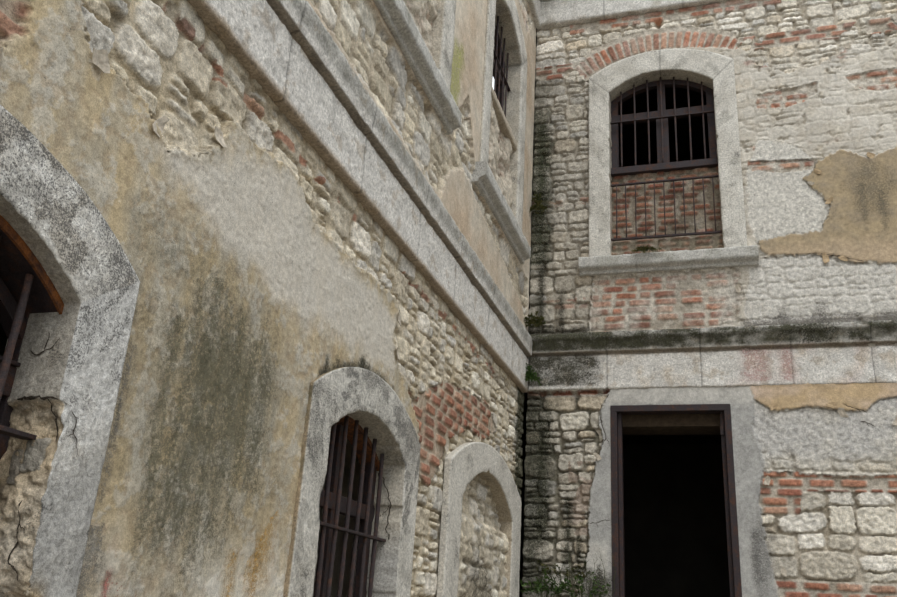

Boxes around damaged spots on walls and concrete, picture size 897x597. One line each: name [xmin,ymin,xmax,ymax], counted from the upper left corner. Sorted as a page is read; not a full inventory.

spalling [310,0,897,335]
spalling [81,0,611,597]
leakage [537,263,546,325]
crack [7,501,25,581]
spalling [0,399,65,597]
leakage [104,350,133,484]
leakage [140,262,278,597]
spalling [748,383,897,597]